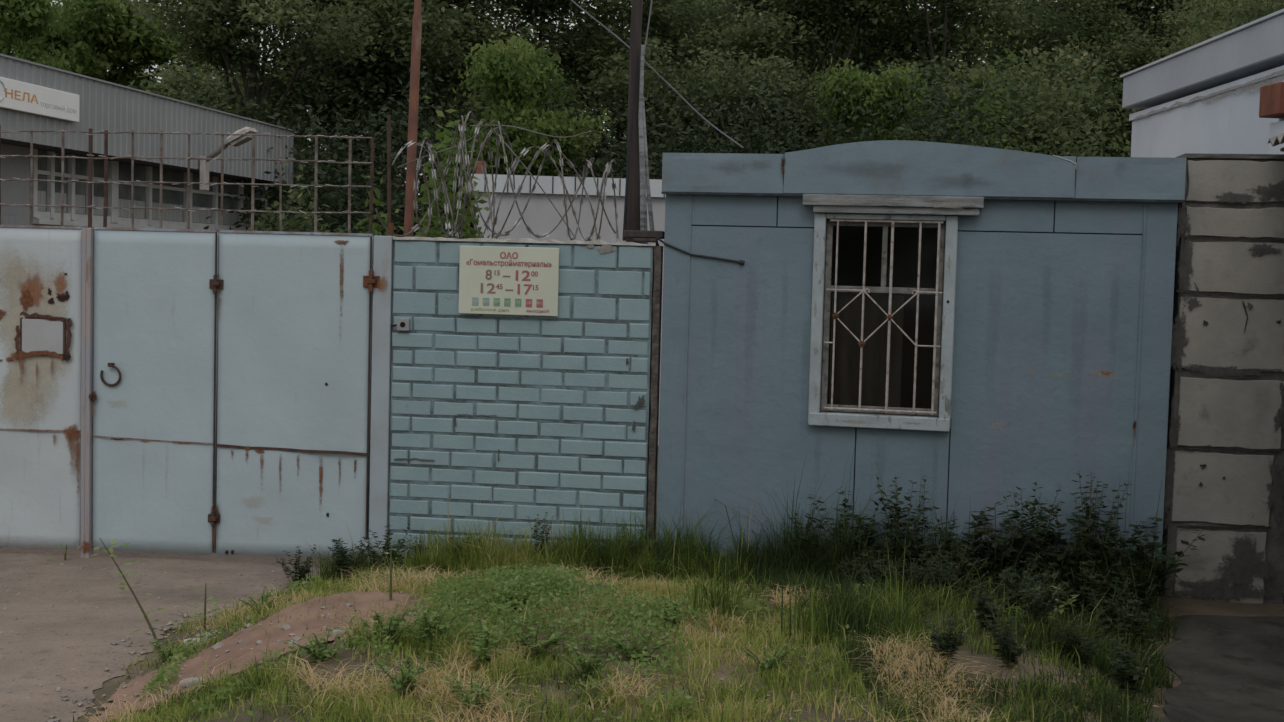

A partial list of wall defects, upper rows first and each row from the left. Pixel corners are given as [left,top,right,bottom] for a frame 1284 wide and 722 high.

rust [336,240,349,308]
rust [0,274,72,384]
rust [53,425,81,492]